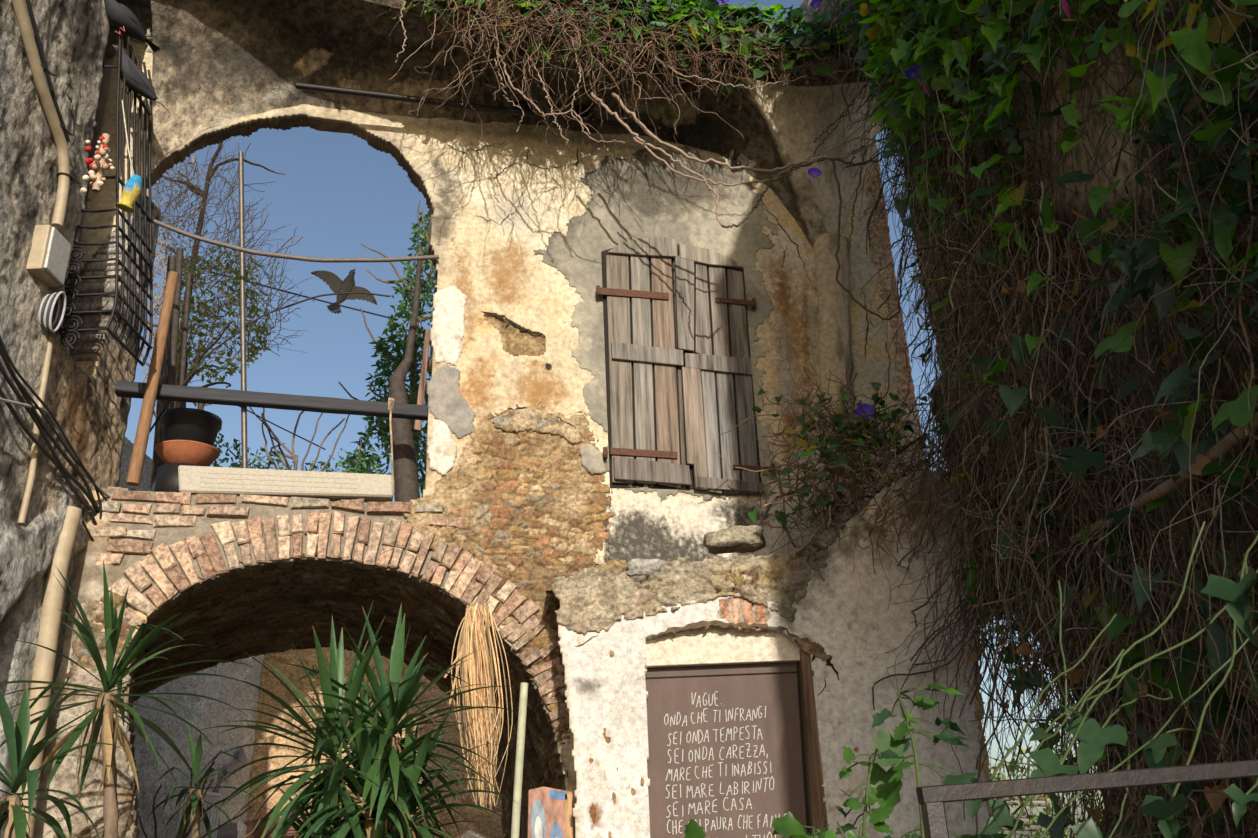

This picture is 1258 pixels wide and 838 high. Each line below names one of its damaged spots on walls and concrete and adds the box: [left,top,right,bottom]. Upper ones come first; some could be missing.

crack [445,140,584,230]
flaking render [430,286,468,367]
corrosion [456,267,472,328]
corrosion [493,246,526,301]
flaking render [484,315,552,369]
flaking render [493,408,583,444]
flaking render [552,509,854,635]
flaking render [795,637,831,661]